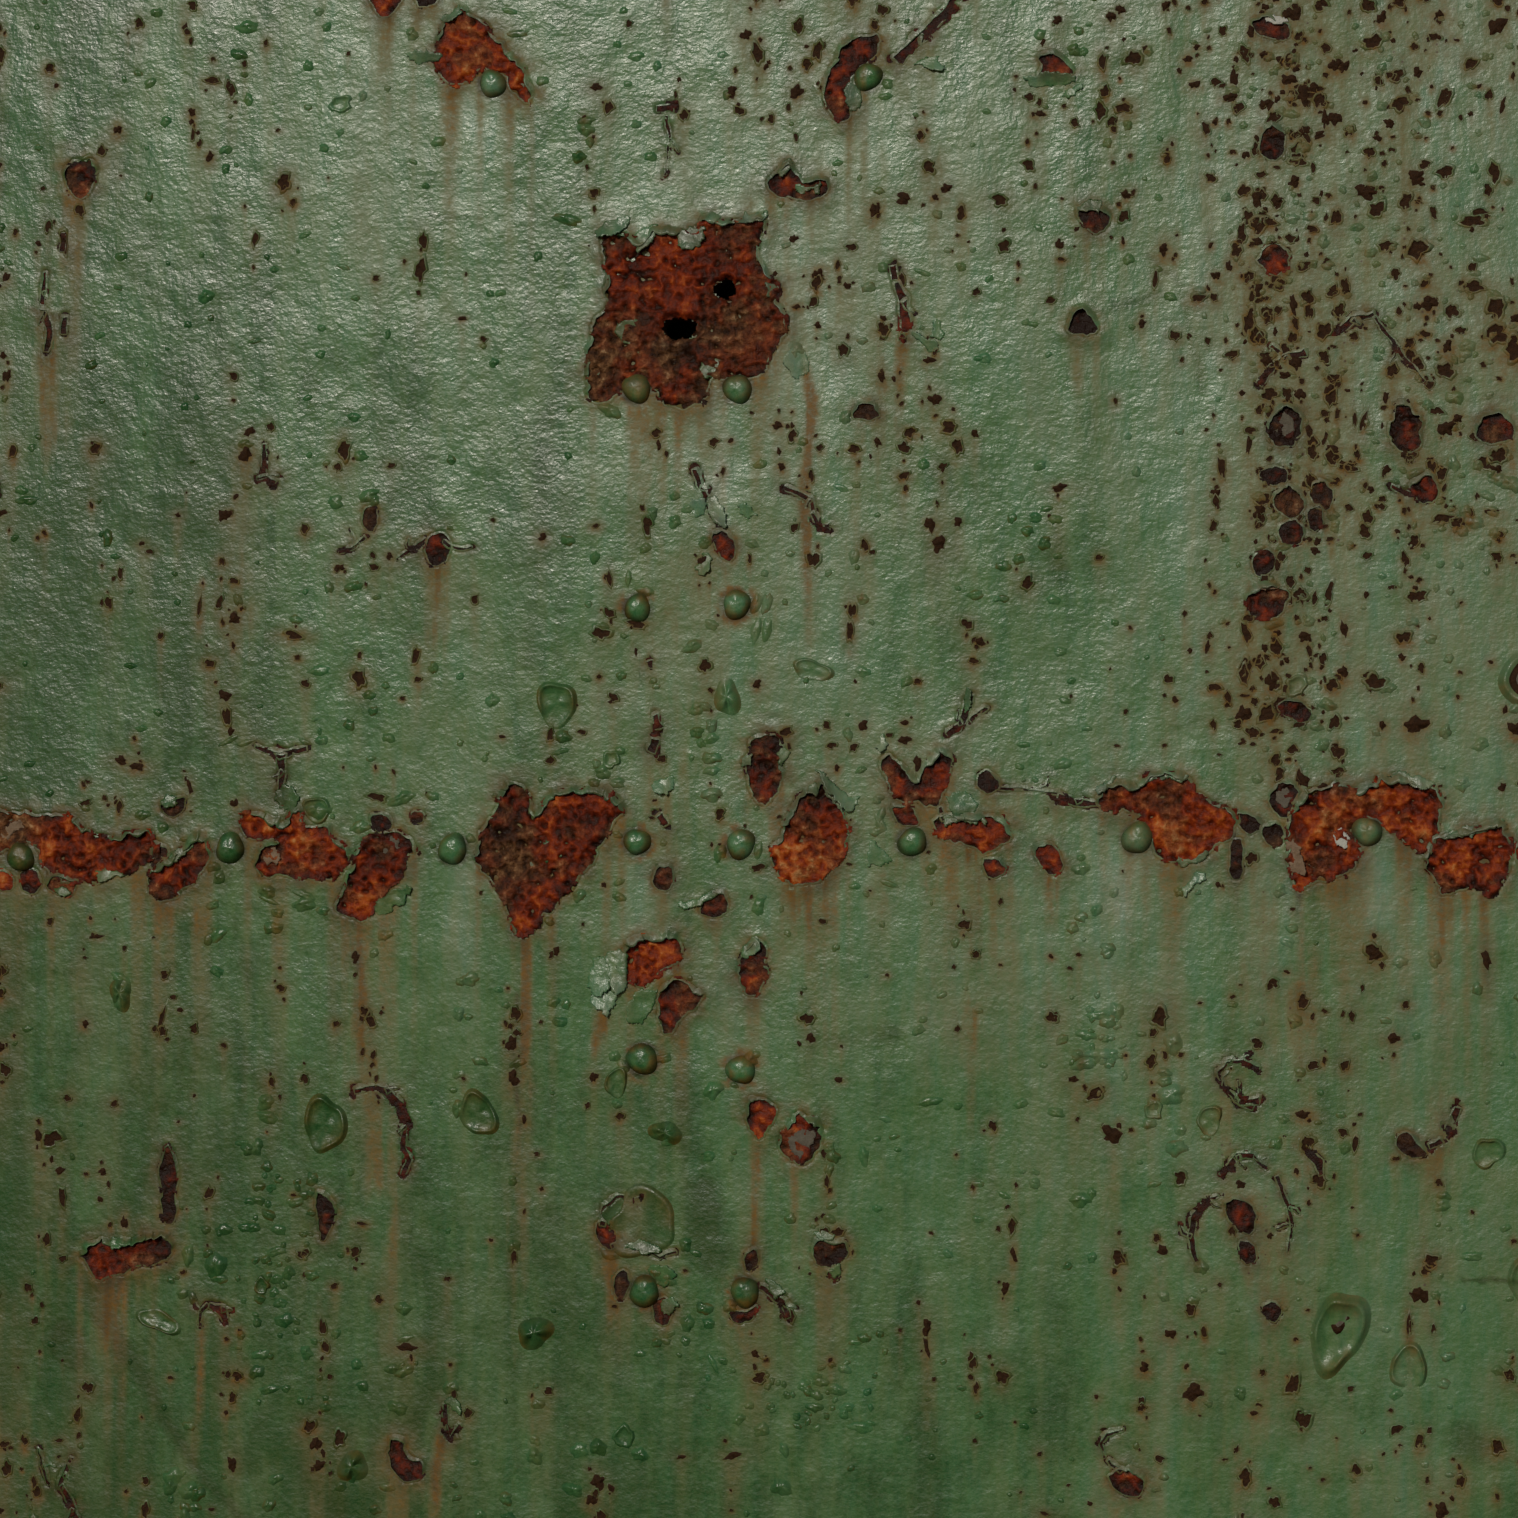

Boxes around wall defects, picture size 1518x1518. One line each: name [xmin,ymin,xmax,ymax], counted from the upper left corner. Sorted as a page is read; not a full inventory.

corrosion [34,125,123,296]
corrosion [181,0,198,47]
corrosion [187,107,215,163]
corrosion [201,56,248,104]
corrosion [1054,187,1137,262]
corrosion [0,351,12,391]
corrosion [471,2,1105,1372]
corrosion [1094,0,1518,1518]
corrosion [0,770,213,1203]
corrosion [229,791,428,1105]
corrosion [0,1220,187,1518]
corrosion [779,1148,863,1412]